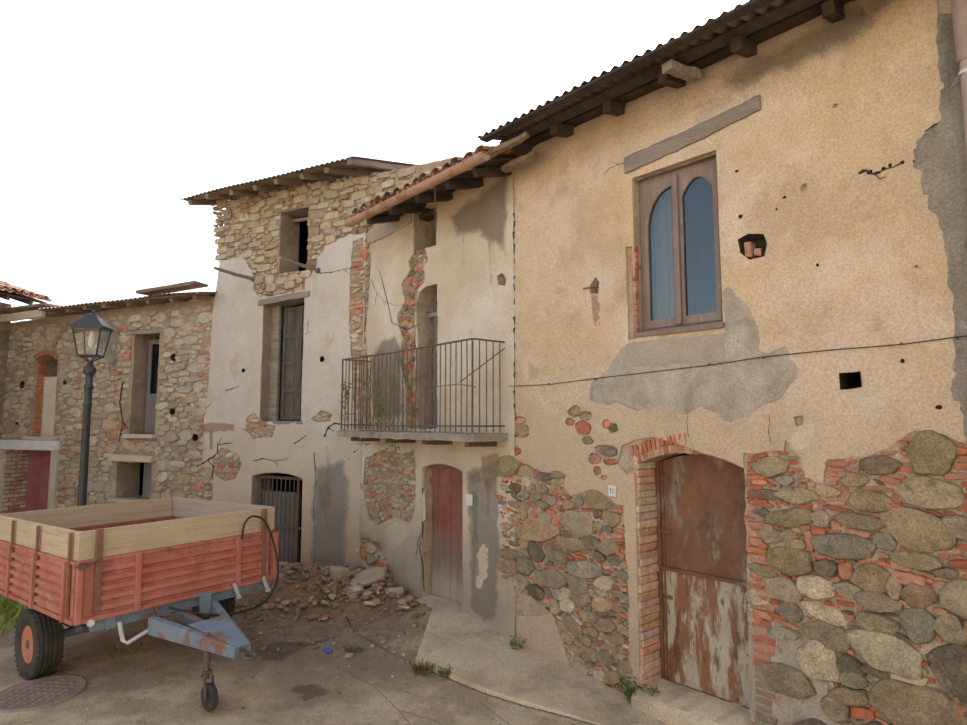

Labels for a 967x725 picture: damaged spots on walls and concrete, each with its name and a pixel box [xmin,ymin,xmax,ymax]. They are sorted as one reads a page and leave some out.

crack [858,161,903,180]
flaking render [190,447,242,501]
flaking render [210,168,420,429]
flaking render [355,450,426,583]
flaking render [397,249,428,429]
damp [468,464,499,620]
flaking render [475,417,633,694]
flaking render [566,407,687,480]
spalling [738,234,767,259]
flaking render [744,415,967,725]
flaking render [839,371,890,410]